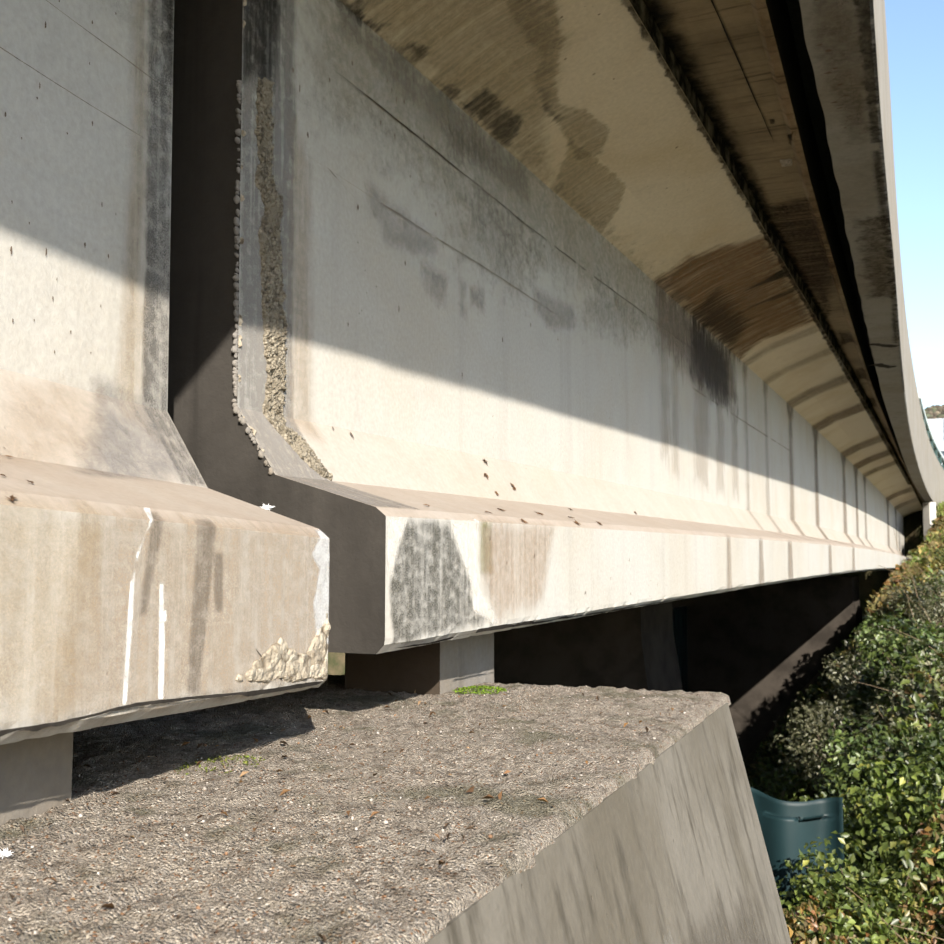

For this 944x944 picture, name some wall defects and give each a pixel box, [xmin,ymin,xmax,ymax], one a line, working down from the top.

crack [46,0,167,89]
leakage [244,0,278,79]
crack [0,47,147,140]
leakage [465,92,521,143]
leakage [624,0,923,568]
leakage [387,521,401,573]
leakage [453,520,546,623]
spalling [235,612,331,684]